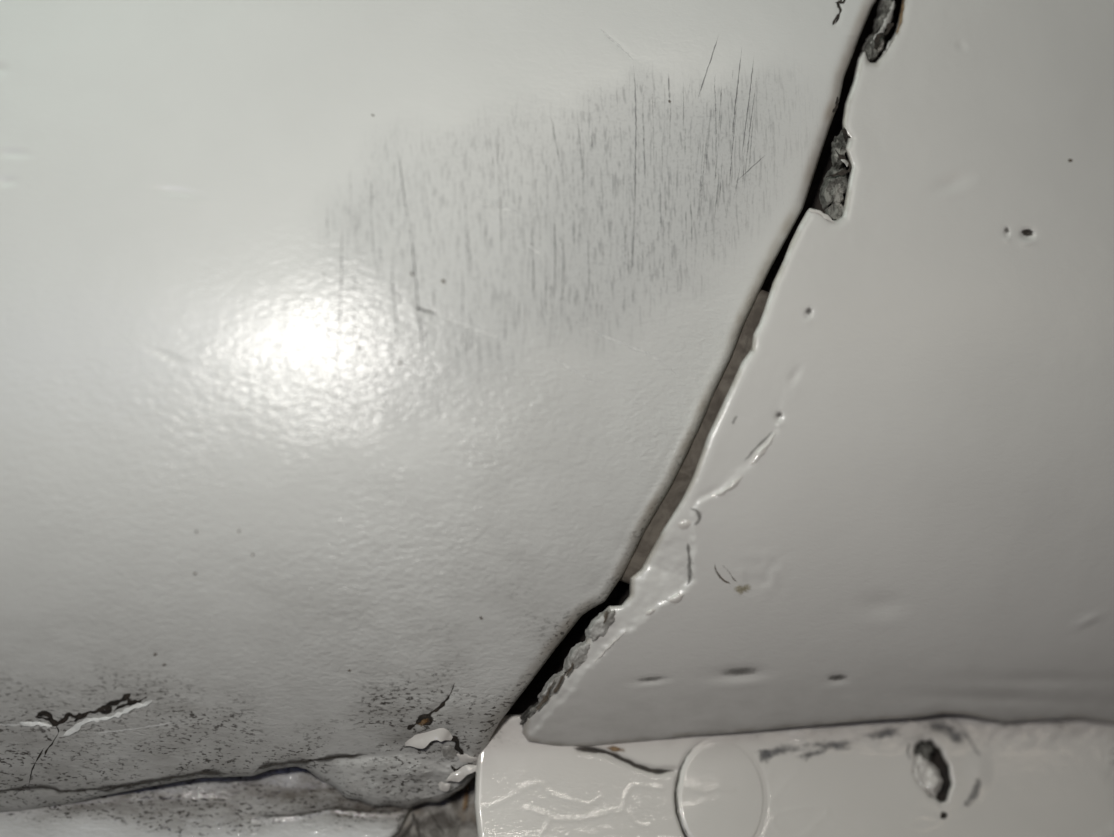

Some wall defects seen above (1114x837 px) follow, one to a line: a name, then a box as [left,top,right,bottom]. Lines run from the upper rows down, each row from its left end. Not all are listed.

crack [832,0,845,25]
peeling [713,407,787,496]
spalling [520,607,627,728]
spalling [405,683,478,792]
spalling [915,741,951,802]